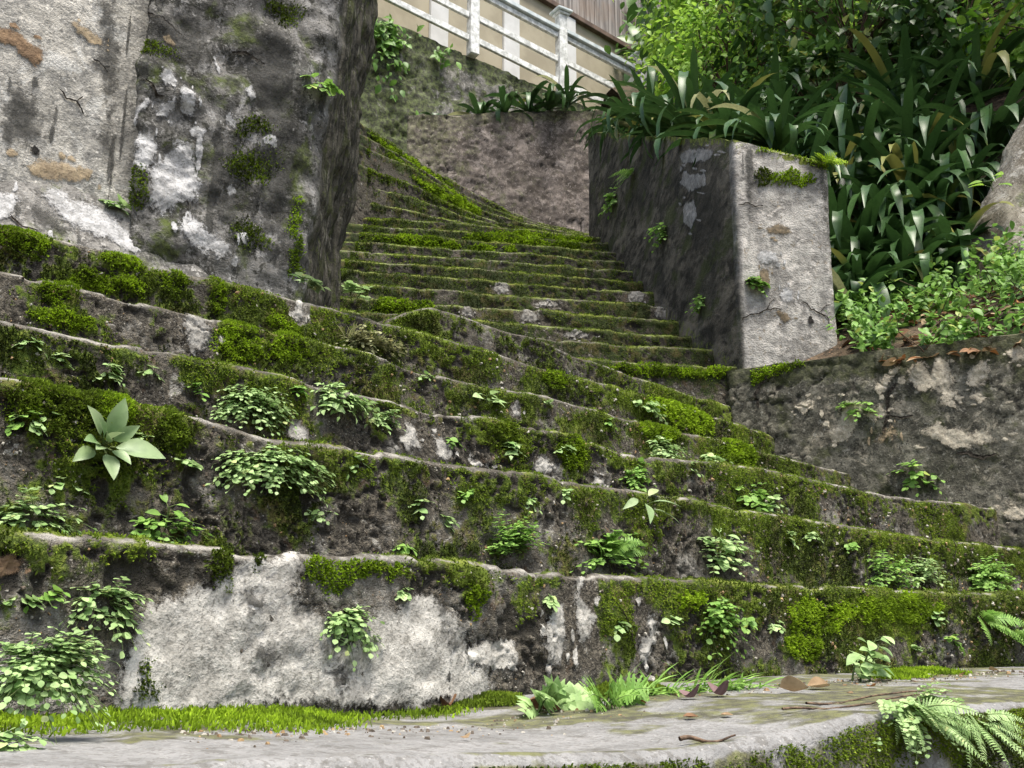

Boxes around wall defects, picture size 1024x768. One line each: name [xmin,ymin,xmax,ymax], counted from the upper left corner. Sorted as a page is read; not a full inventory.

spalling [0,22,47,67]
crack [60,89,84,114]
flaking render [679,144,726,235]
crack [742,299,831,327]